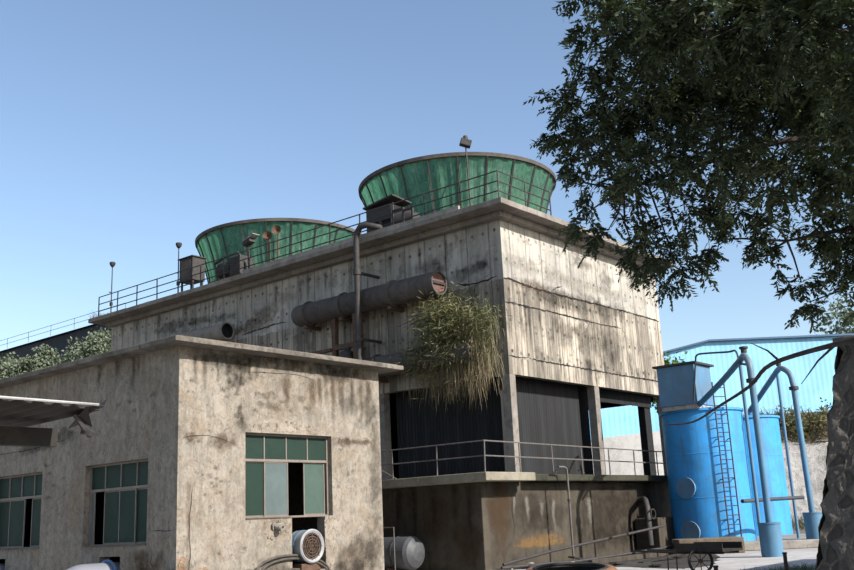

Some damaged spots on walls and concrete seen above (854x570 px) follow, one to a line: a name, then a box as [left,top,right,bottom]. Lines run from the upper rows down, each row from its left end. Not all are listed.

crack [150,484,196,570]